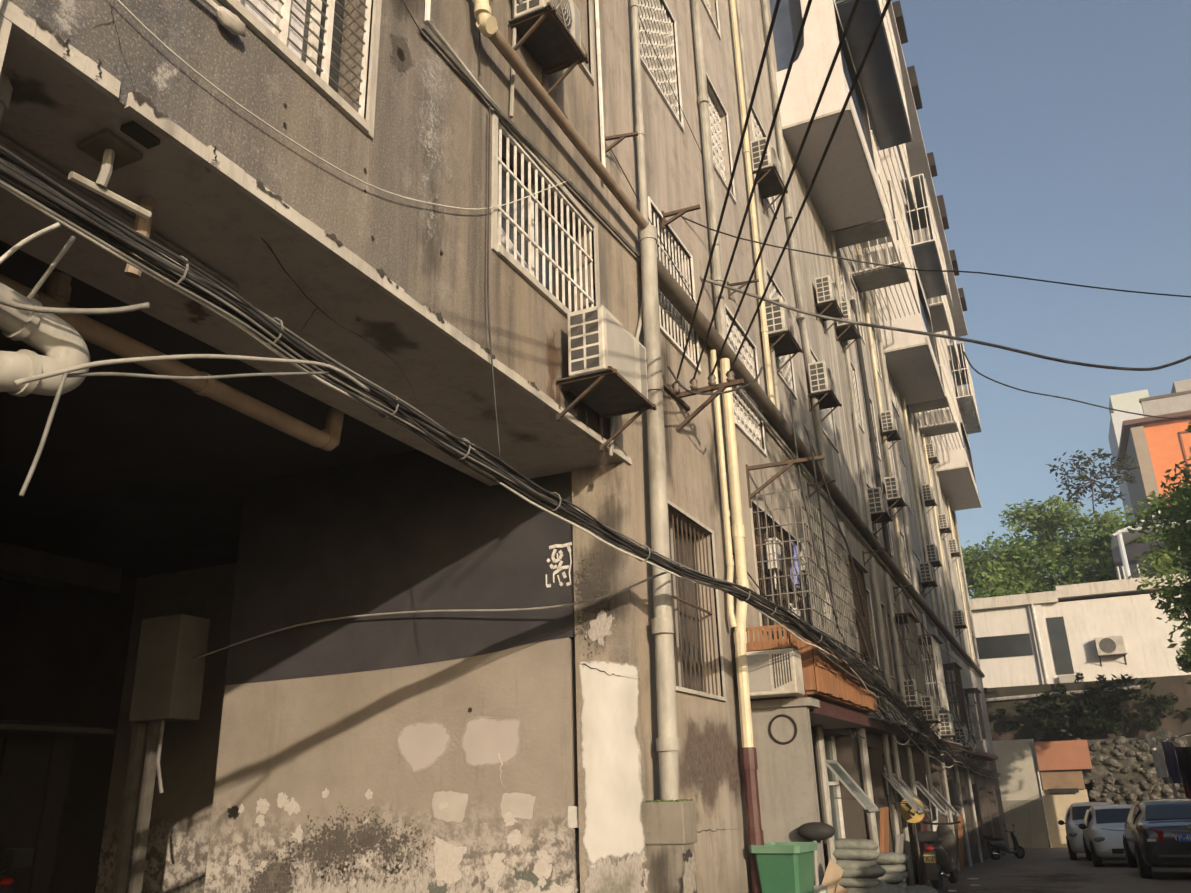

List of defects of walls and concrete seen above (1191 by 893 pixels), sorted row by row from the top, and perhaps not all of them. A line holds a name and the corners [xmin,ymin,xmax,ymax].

water stain [680,721,743,808]
water stain [227,806,239,819]
water stain [245,802,435,893]
peeling [219,792,651,893]
water stain [427,882,448,893]
water stain [514,868,553,891]